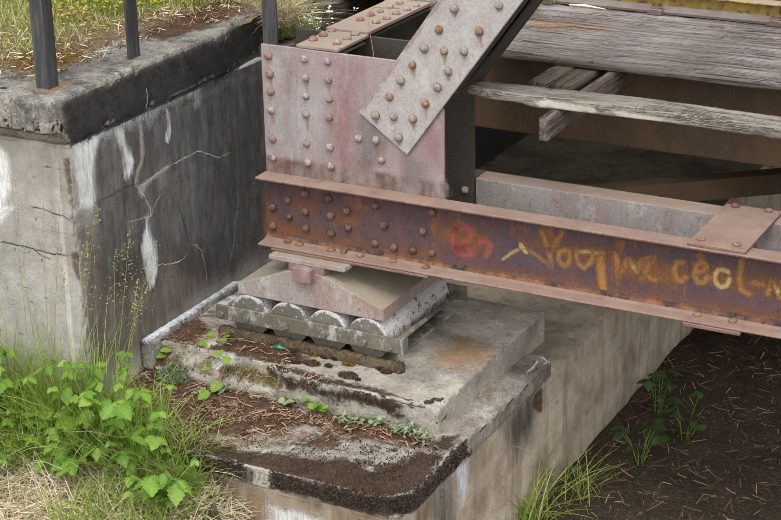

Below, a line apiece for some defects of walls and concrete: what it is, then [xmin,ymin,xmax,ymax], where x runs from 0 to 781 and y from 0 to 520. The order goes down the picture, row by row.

crack [2,241,69,259]
crack [98,151,227,222]
damp [72,68,267,363]